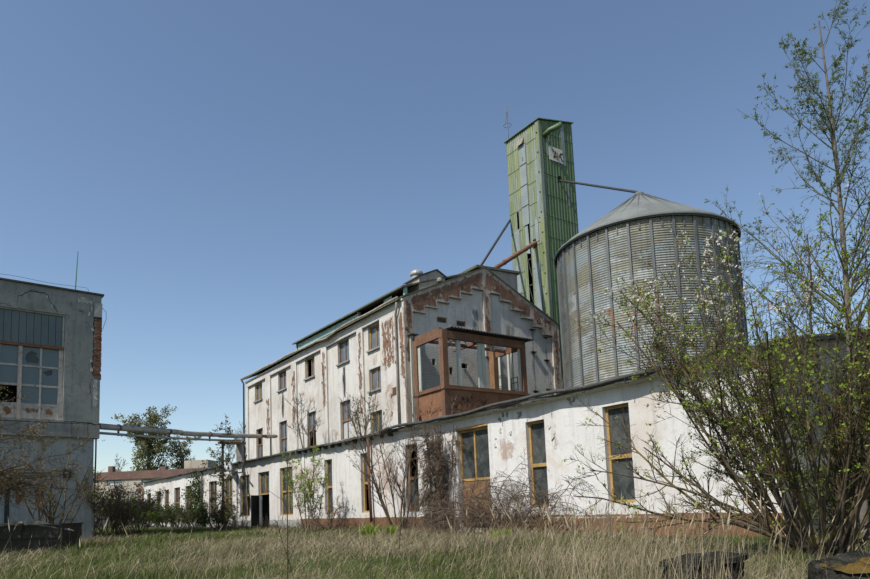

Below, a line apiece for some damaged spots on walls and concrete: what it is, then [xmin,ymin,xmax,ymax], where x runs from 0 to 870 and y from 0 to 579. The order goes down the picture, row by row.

flaking render [78,297,103,407]
peeling [381,273,560,419]
peeling [494,411,522,459]